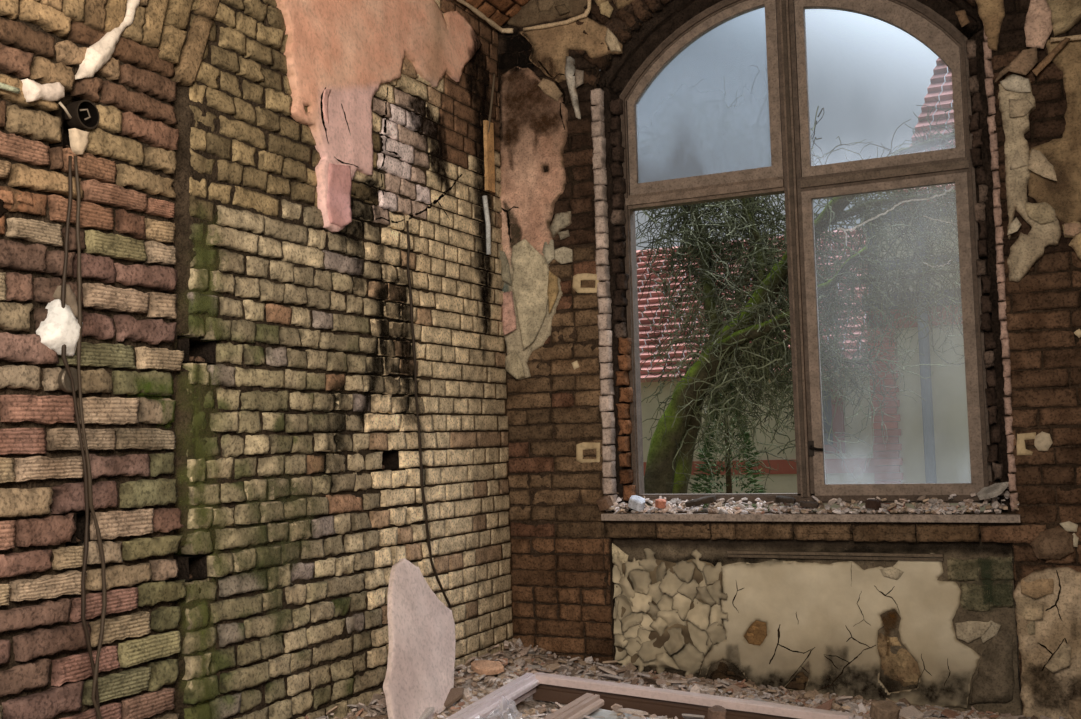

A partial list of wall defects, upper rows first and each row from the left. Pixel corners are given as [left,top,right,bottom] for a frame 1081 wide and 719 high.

flaking render [276,0,480,232]
water stain [406,95,450,194]
flaking render [499,0,634,380]
flaking render [994,0,1081,282]
peeling [612,543,628,564]
crack [769,564,899,691]
peeling [698,553,1001,708]
crack [918,654,950,686]
crack [1038,570,1067,671]